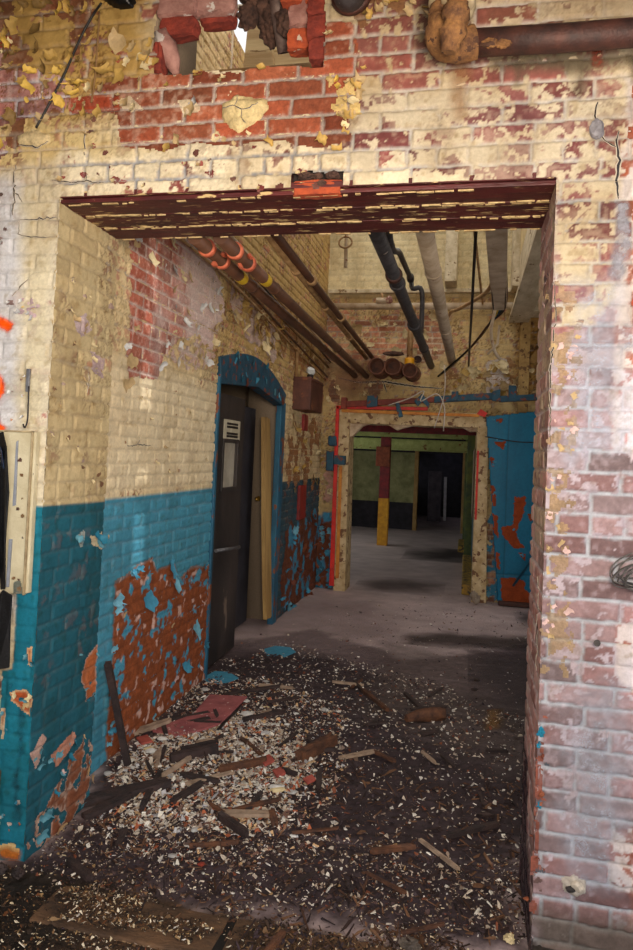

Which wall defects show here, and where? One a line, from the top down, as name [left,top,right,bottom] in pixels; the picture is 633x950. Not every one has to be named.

flaking render [0,0,429,190]
spalling [257,168,344,200]
crack [593,102,622,199]
peeling [280,414,334,613]
peeling [12,577,22,594]
peeling [0,685,33,739]
peeling [23,646,34,667]
peeling [79,644,99,701]
peeling [105,557,210,761]
peeling [26,731,95,850]